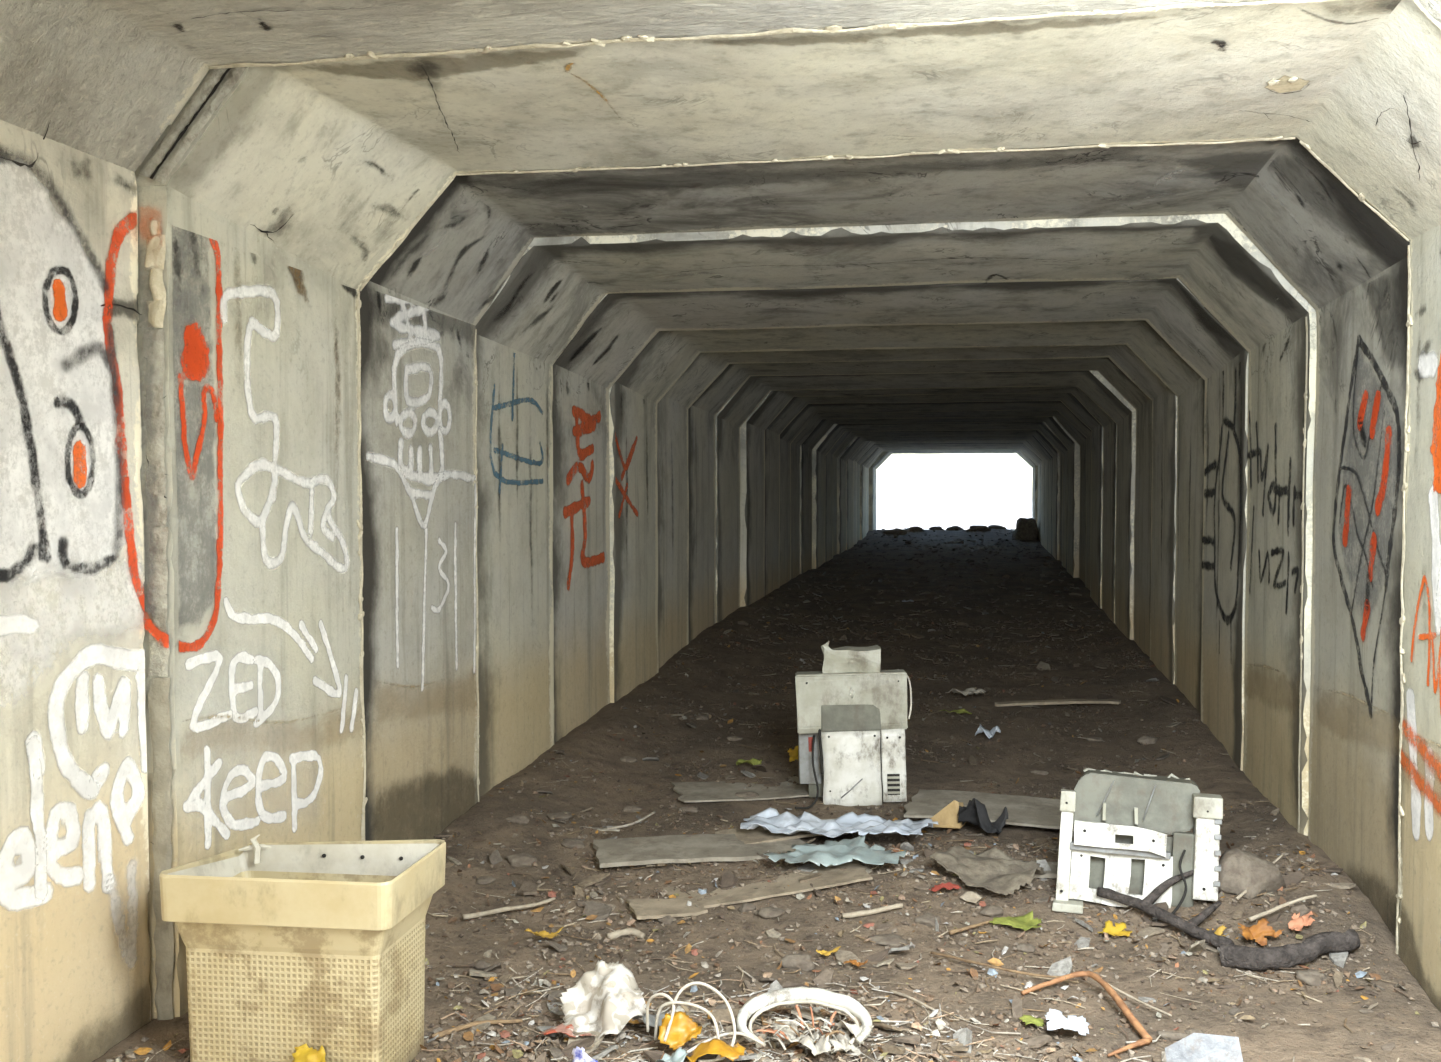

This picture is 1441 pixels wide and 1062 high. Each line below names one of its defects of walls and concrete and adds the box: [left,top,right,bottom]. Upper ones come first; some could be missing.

spalling [1413,0,1441,30]
crack [415,63,460,153]
spalling [138,0,1336,184]